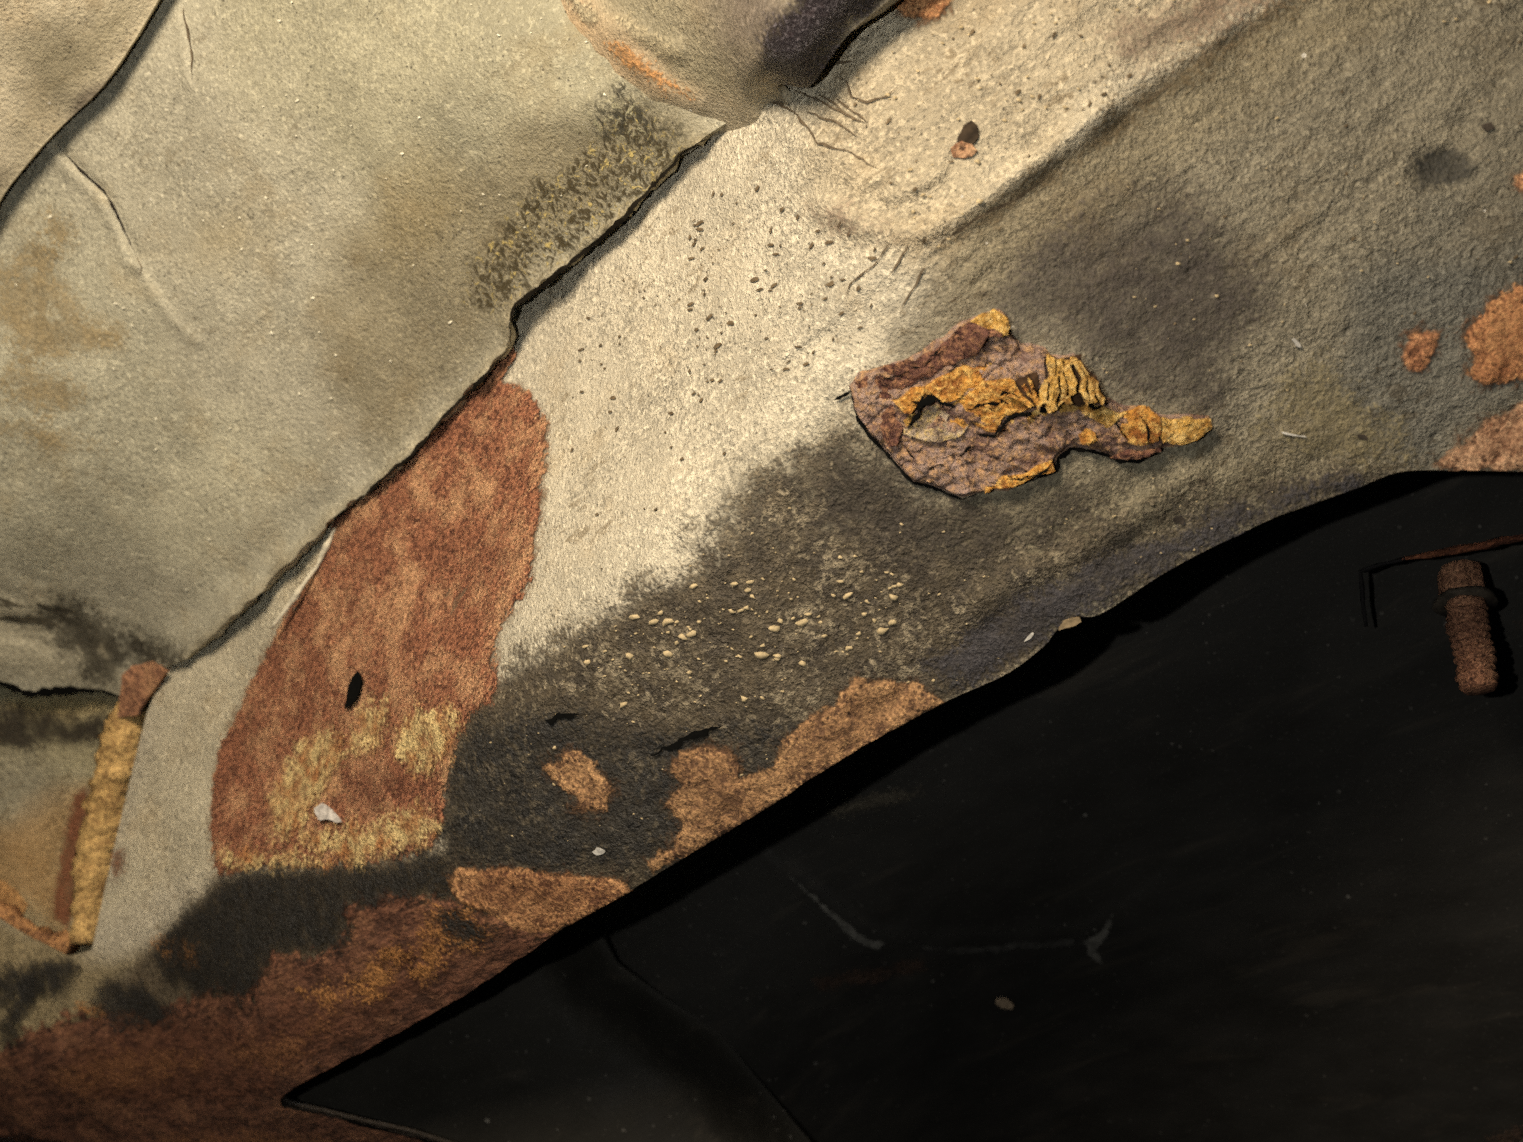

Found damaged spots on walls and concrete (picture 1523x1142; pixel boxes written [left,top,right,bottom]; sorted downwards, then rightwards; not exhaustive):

water stain [466,82,681,314]
spalling [638,185,877,402]
corrosion [834,308,1212,500]
corrosion [1398,321,1442,372]
corrosion [1436,282,1523,471]
crack [0,681,118,698]
corrosion [52,788,88,928]
corrosion [206,346,550,877]
corrosion [542,744,619,814]
corrosion [643,676,944,871]
water stain [436,362,1430,891]
corrosion [0,863,630,1142]